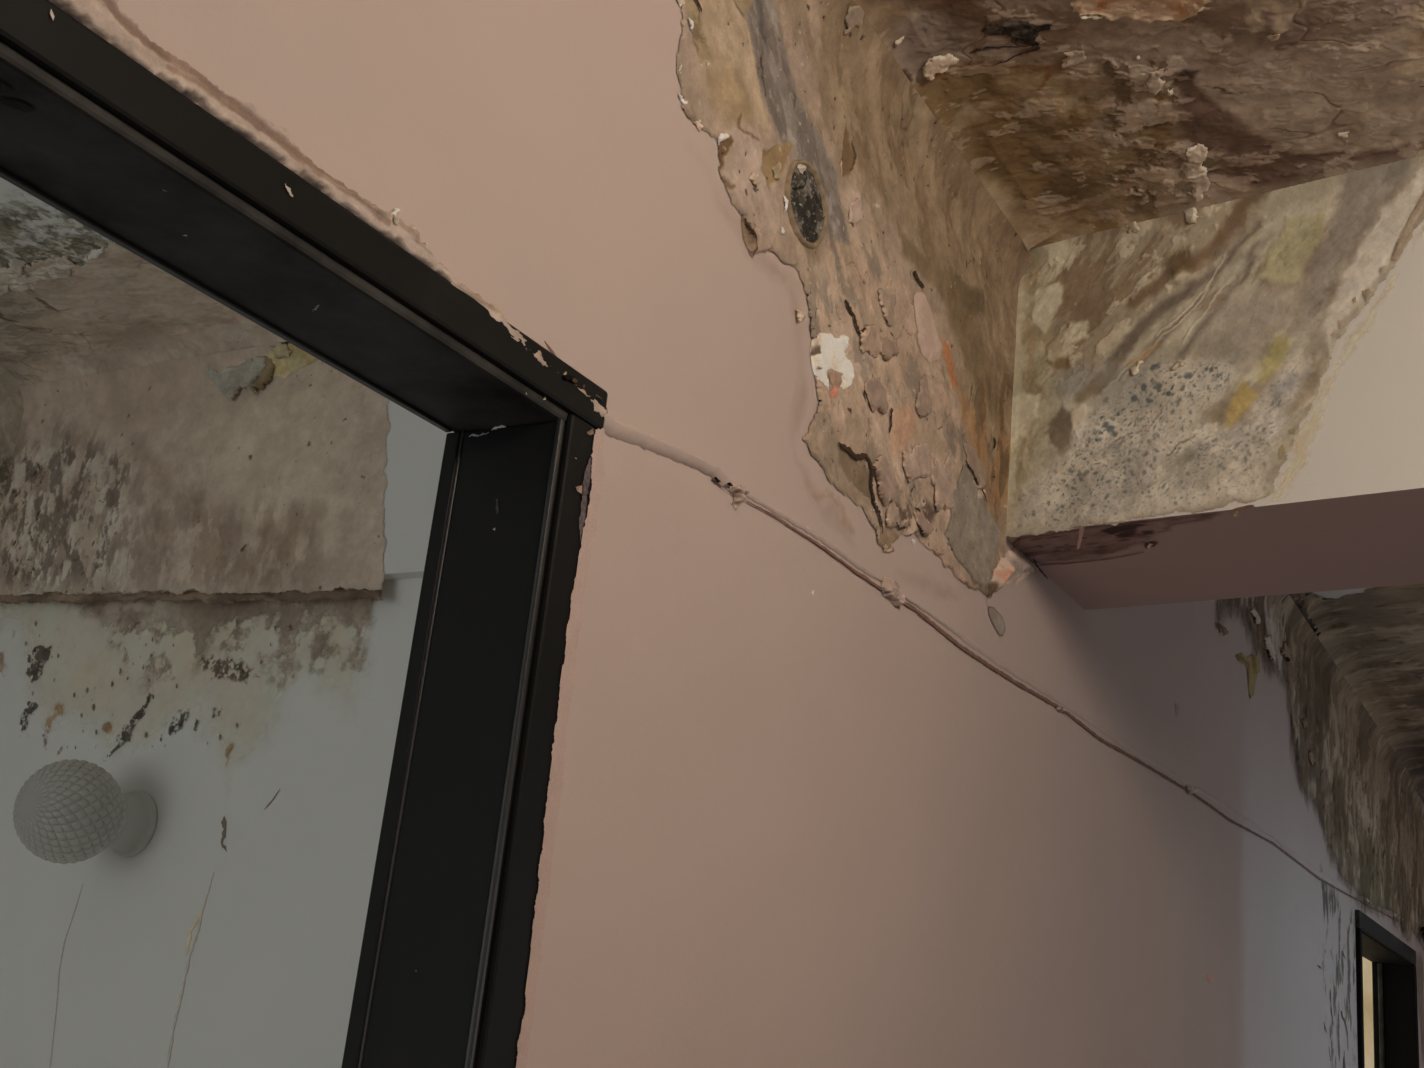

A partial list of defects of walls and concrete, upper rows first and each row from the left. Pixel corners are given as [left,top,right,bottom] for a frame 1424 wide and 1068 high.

leakage [0,204,120,269]
peeling [0,241,319,401]
spalling [0,588,383,605]
leakage [0,342,391,758]
crack [838,390,934,533]
crack [604,413,1402,924]
peeling [676,0,1424,636]
leakage [1006,155,1424,566]